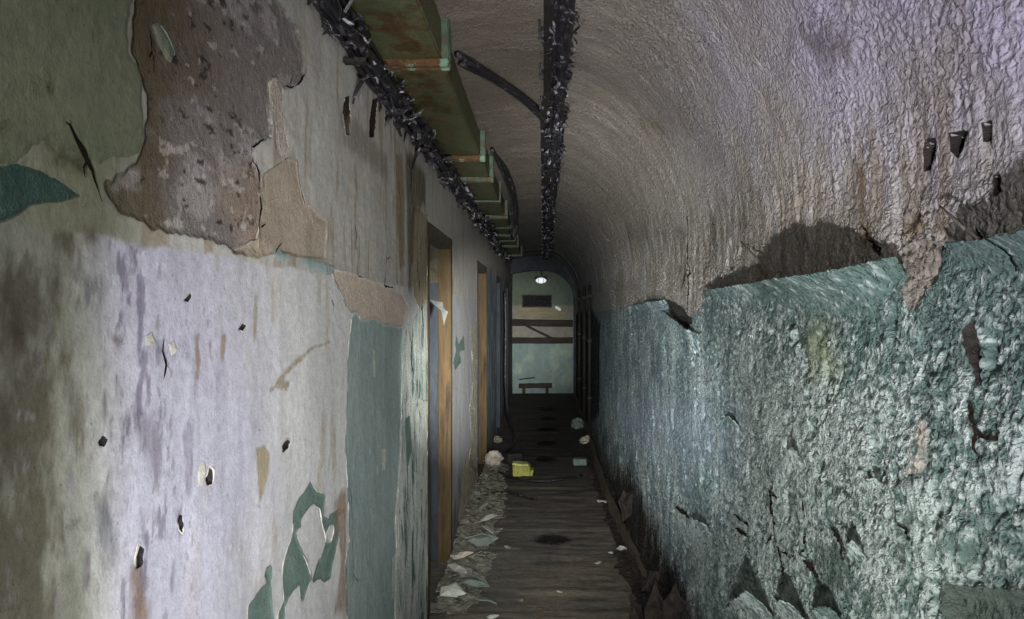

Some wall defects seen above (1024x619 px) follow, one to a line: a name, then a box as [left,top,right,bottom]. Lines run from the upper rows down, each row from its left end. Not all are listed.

crack [66,122,102,201]
spalling [0,0,328,260]
peeling [705,205,1024,327]
peeling [198,462,215,488]
peeling [247,207,448,619]
crack [967,404,1000,467]
spalling [134,542,144,569]